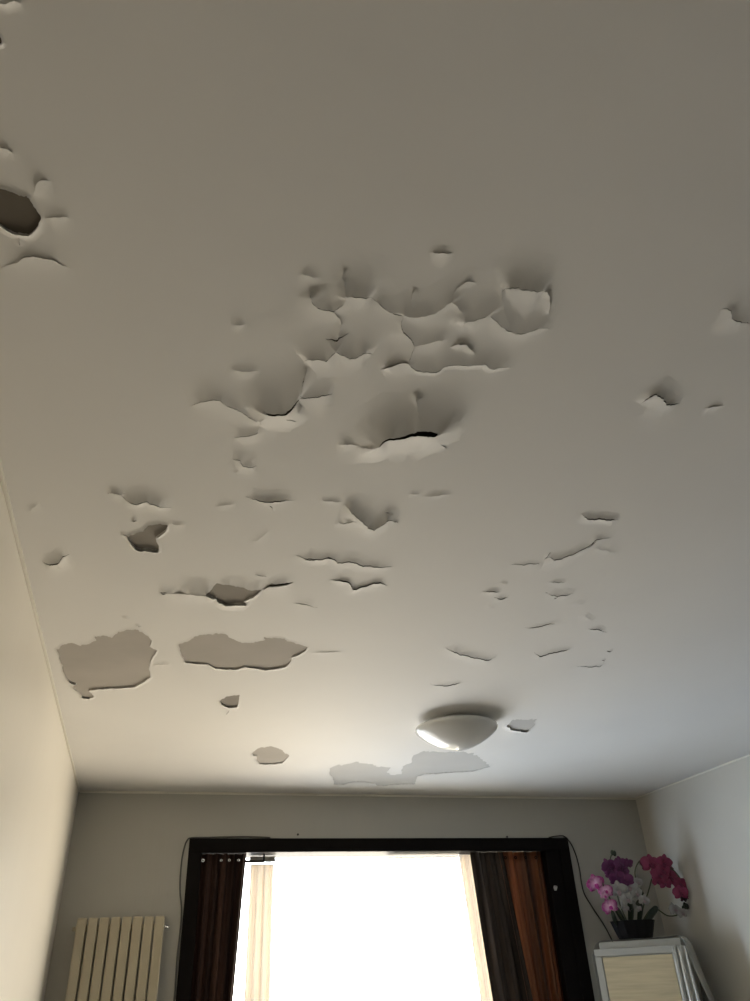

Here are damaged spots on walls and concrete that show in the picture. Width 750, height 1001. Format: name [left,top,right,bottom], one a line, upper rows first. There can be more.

spalling [0,128,78,291]
spalling [119,520,187,554]
peeling [317,489,409,549]
peeling [507,528,621,571]
spalling [158,564,300,612]
flaking render [54,614,345,701]
flaking render [216,692,243,716]
flaking render [488,717,539,743]
flaking render [249,745,291,770]
flaking render [325,749,492,788]